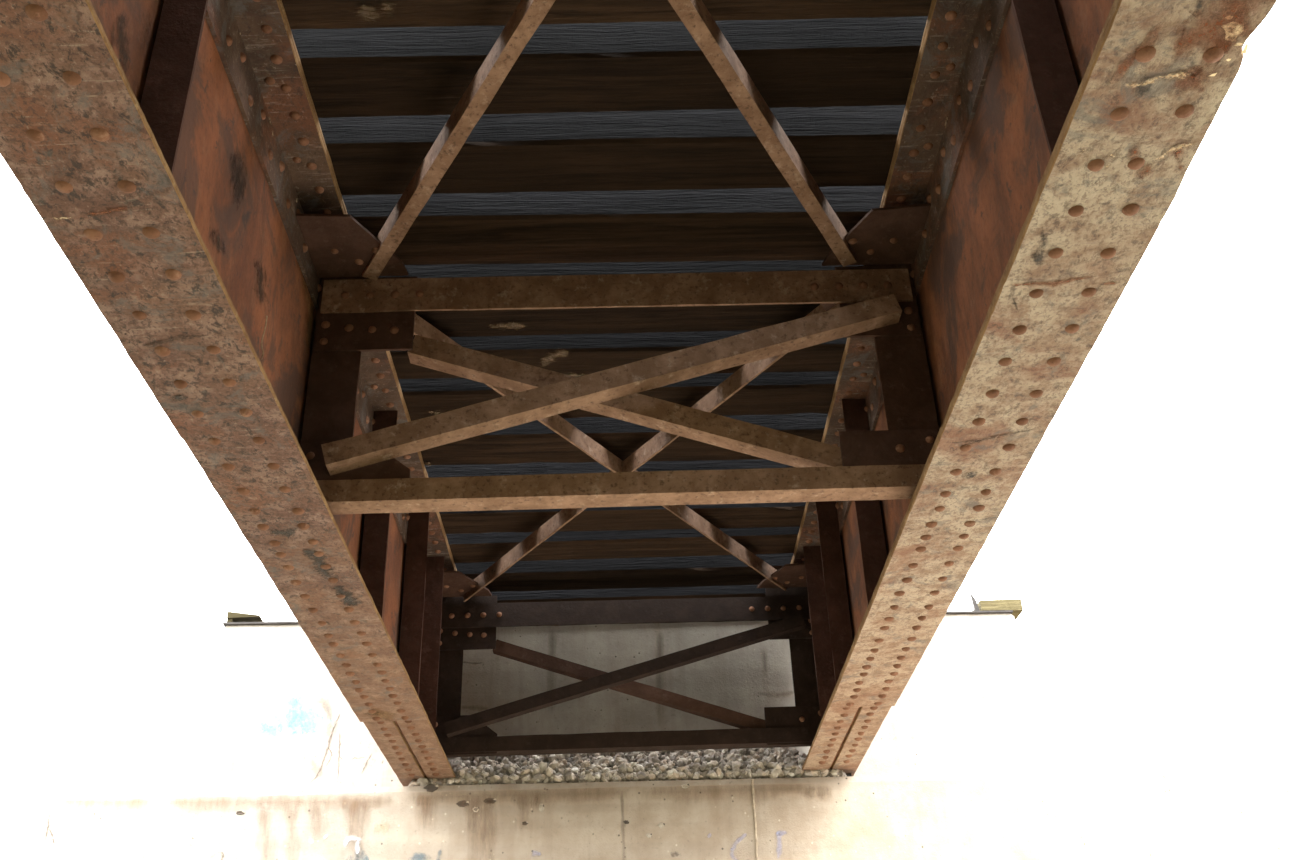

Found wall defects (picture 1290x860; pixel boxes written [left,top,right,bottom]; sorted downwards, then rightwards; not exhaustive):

rust [1173,0,1248,90]
peeling [1223,22,1249,61]
rust [1012,277,1116,287]